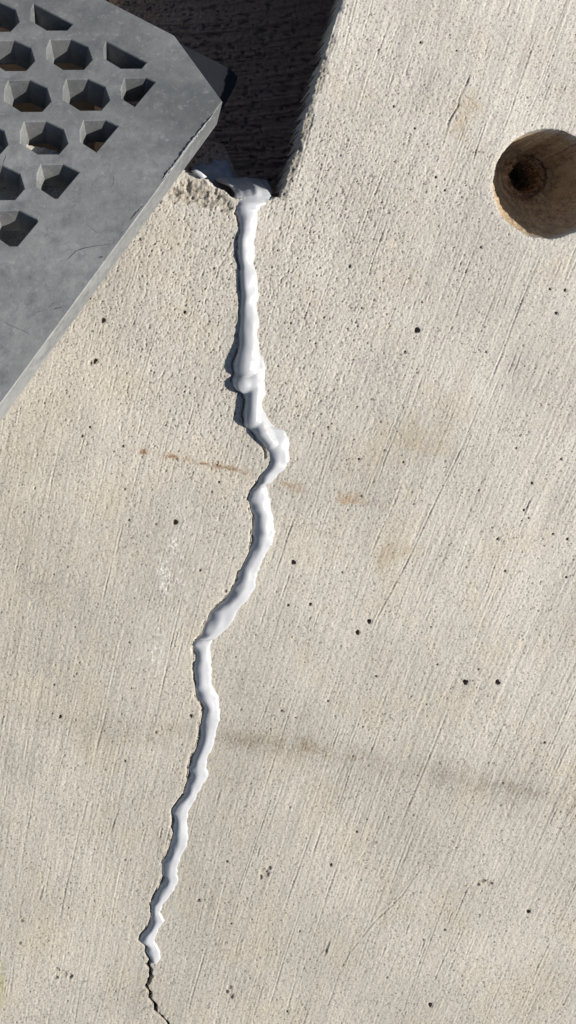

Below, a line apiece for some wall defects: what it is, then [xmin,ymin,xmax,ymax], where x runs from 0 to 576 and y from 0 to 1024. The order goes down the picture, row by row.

crack [147,957,169,1024]